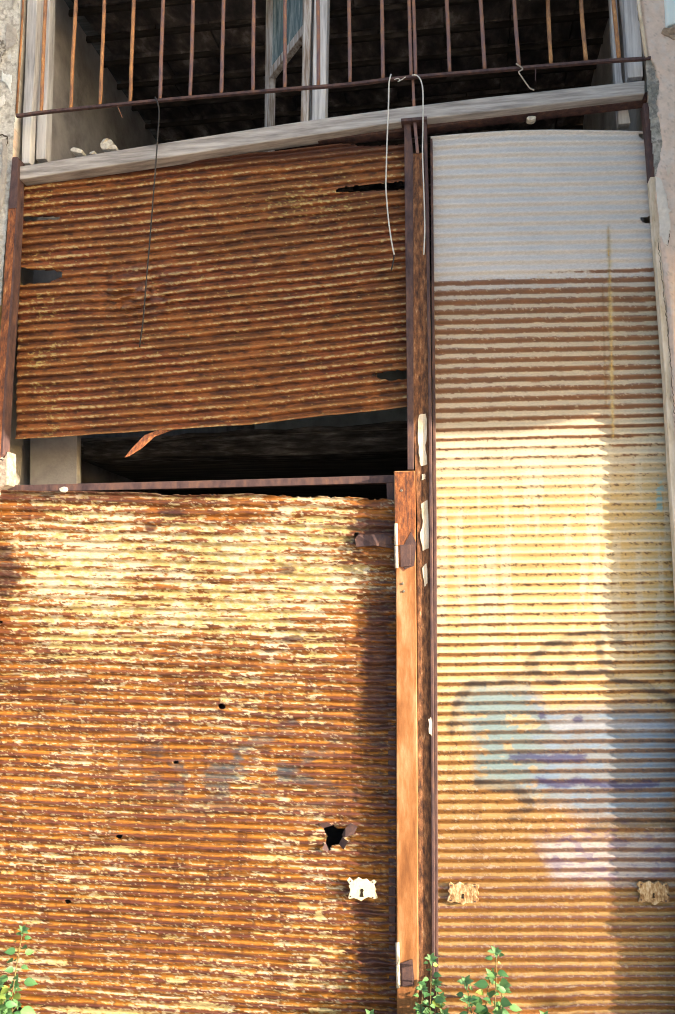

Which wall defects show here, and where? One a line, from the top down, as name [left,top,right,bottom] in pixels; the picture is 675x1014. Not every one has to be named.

spalling [0,0,21,305]